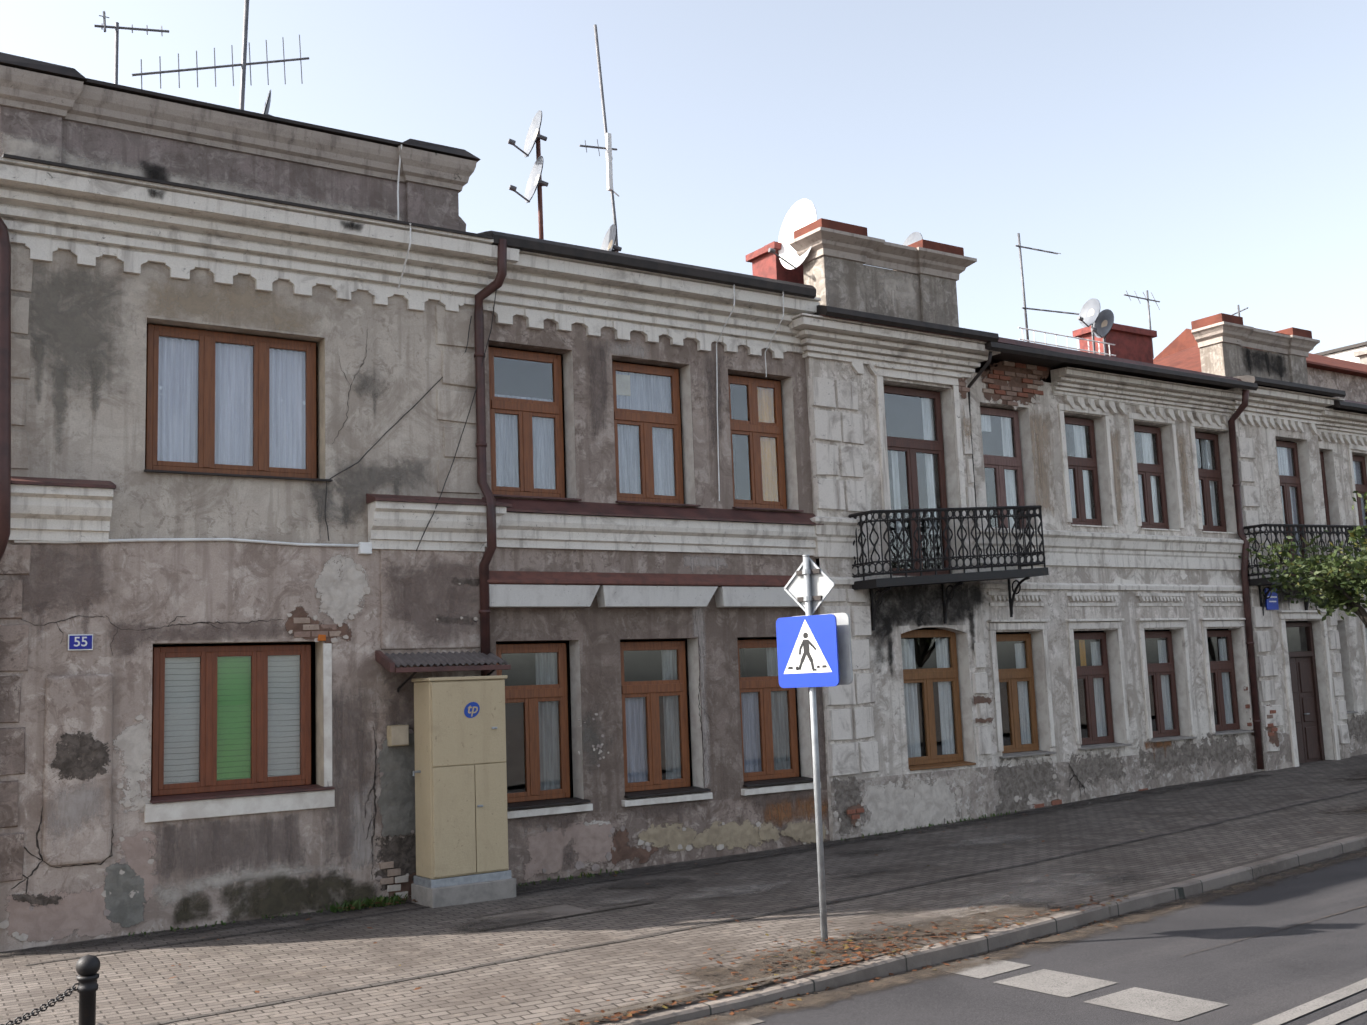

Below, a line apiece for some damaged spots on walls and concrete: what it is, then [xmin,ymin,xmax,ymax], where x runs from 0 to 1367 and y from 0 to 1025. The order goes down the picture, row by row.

damp [28,271,120,446]
crack [332,329,368,444]
flaking render [950,361,1051,410]
flaking render [285,554,370,643]
flaking render [51,714,152,813]
crack [11,806,43,893]
flaking render [113,831,159,902]
damp [156,817,316,913]
flaking render [374,834,416,899]
flaking render [523,819,767,881]
flaking render [0,885,113,942]